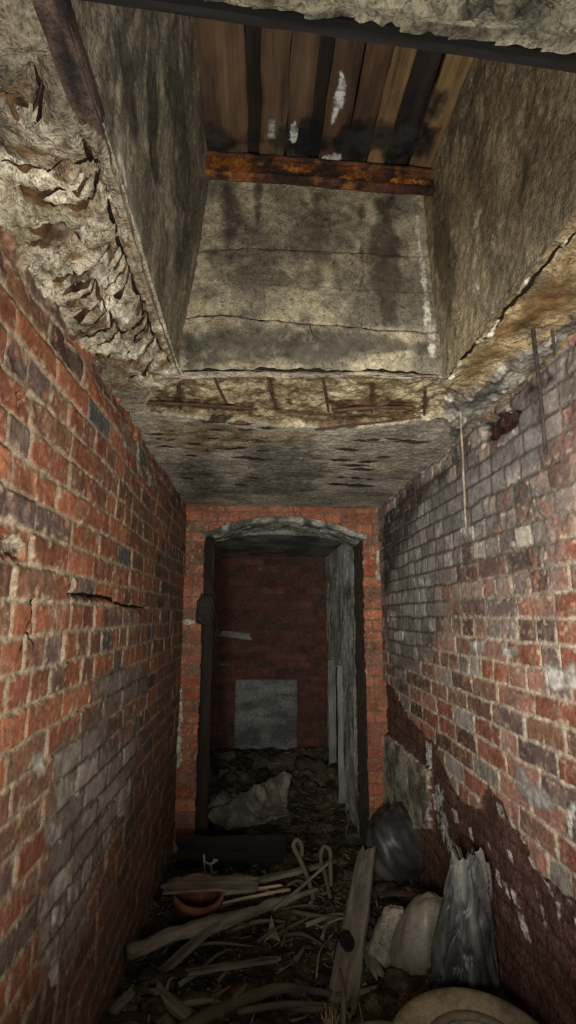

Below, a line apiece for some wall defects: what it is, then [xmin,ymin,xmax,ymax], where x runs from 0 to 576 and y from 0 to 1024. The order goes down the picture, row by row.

leakage [270,91,445,165]
corrosion [272,159,314,173]
corrosion [390,175,429,185]
spalling [0,0,576,487]
crack [73,134,576,381]
leakage [360,197,399,321]
leakage [414,212,454,358]
leakage [186,328,405,365]
corrosion [157,382,253,411]
corrosion [319,384,428,429]
crack [67,592,144,620]
spalling [386,683,576,1024]